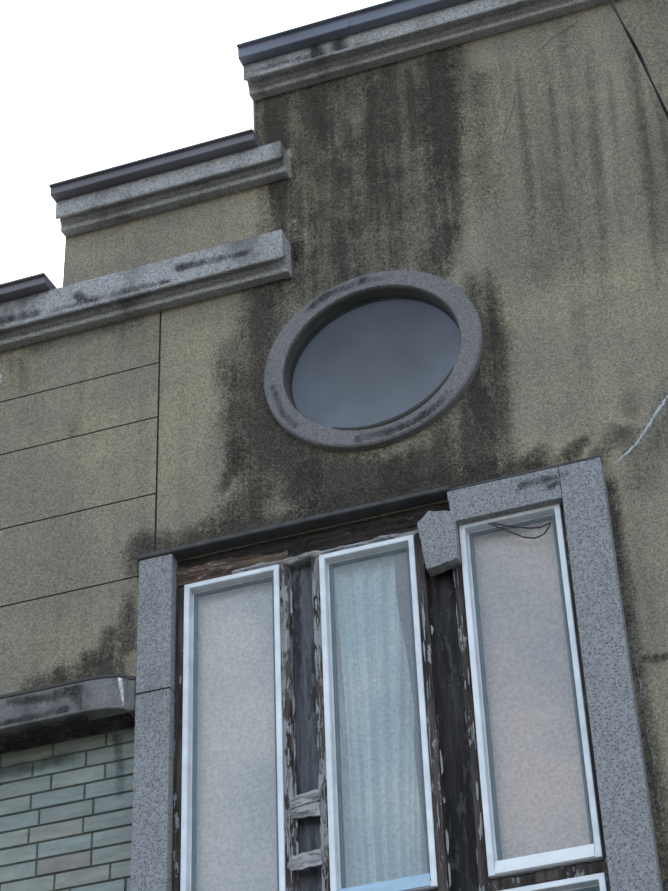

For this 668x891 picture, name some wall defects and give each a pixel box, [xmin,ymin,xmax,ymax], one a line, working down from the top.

leakage [212,43,509,526]
leakage [563,437,604,460]
crack [611,395,668,466]
spalling [177,502,462,625]
peeling [281,589,295,715]
peeling [422,589,434,659]
peeling [285,735,297,796]
peeling [287,810,299,882]
peeling [437,797,451,887]